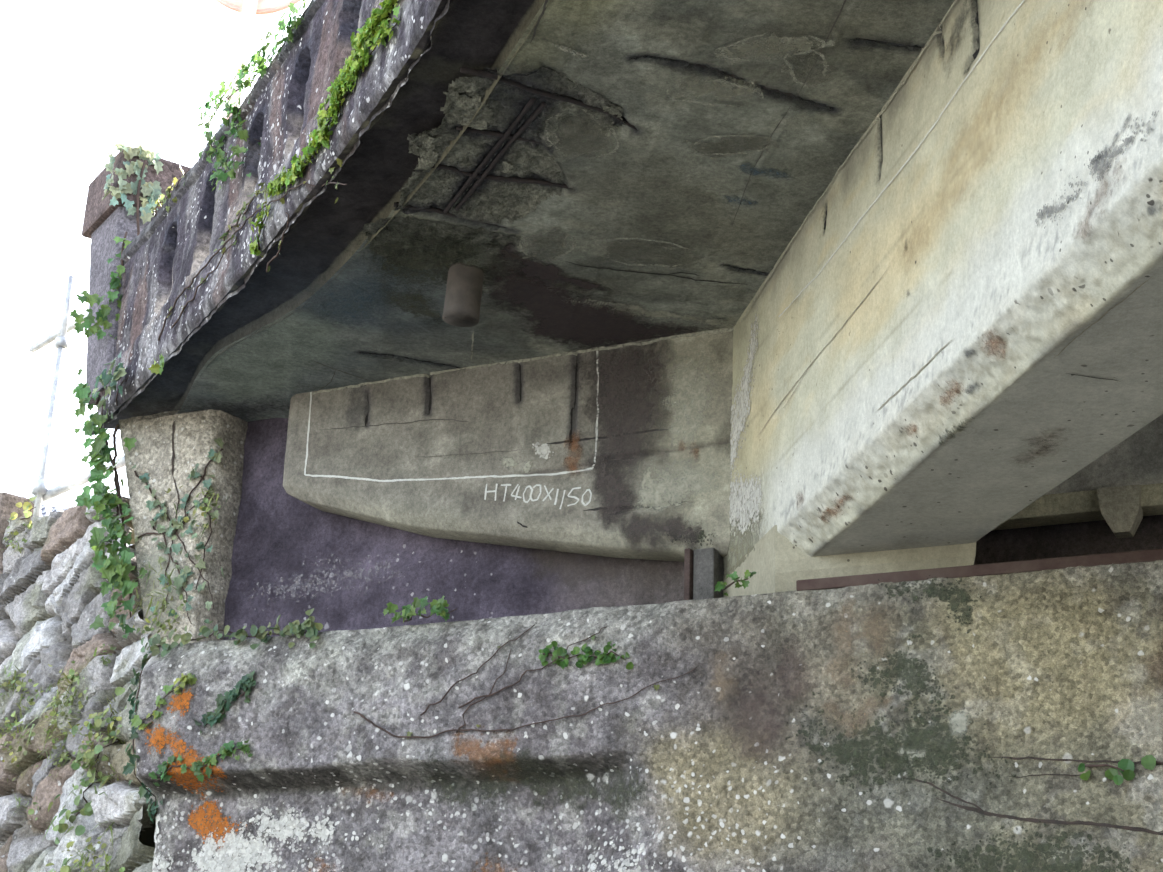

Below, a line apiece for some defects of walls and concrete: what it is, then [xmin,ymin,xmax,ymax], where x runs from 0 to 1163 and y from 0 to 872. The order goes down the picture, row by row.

spalling [359,67,636,293]
damp [311,0,958,550]
crack [732,0,846,225]
crack [171,422,180,518]